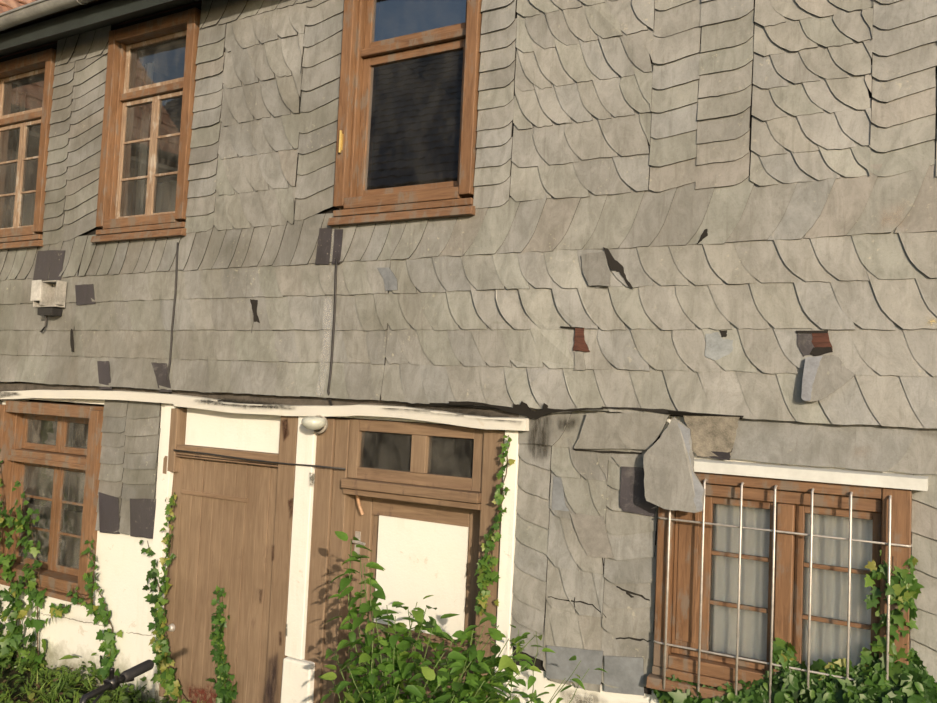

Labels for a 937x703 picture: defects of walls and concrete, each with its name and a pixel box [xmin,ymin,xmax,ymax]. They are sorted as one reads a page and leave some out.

peeling [801,356,822,401]
peeling [612,457,643,467]
spalling [668,411,742,511]